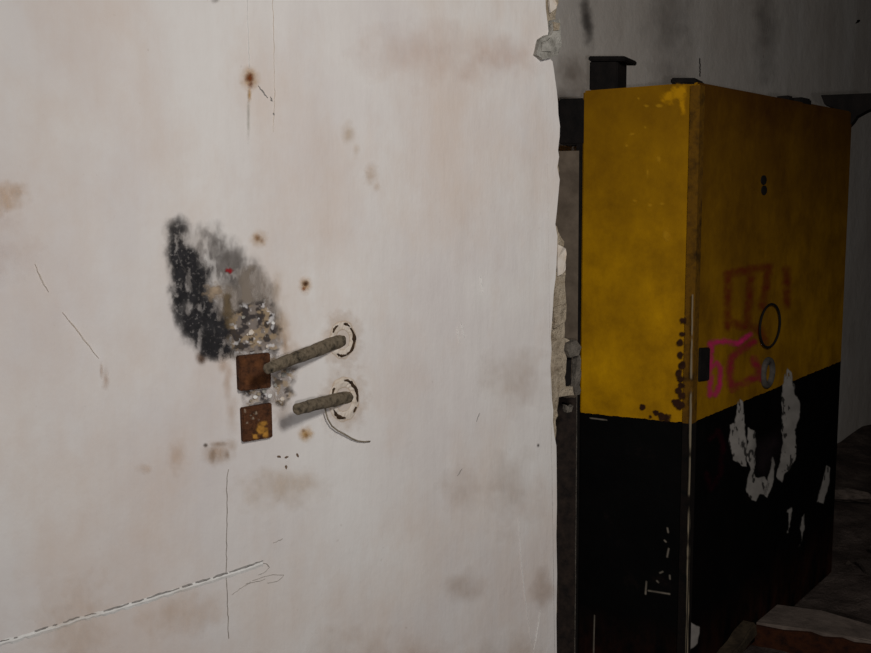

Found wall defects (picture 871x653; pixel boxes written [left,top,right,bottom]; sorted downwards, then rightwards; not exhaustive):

peeling [229,302,278,361]
flaking render [329,320,356,359]
peeling [243,367,296,406]
crack [0,469,284,646]